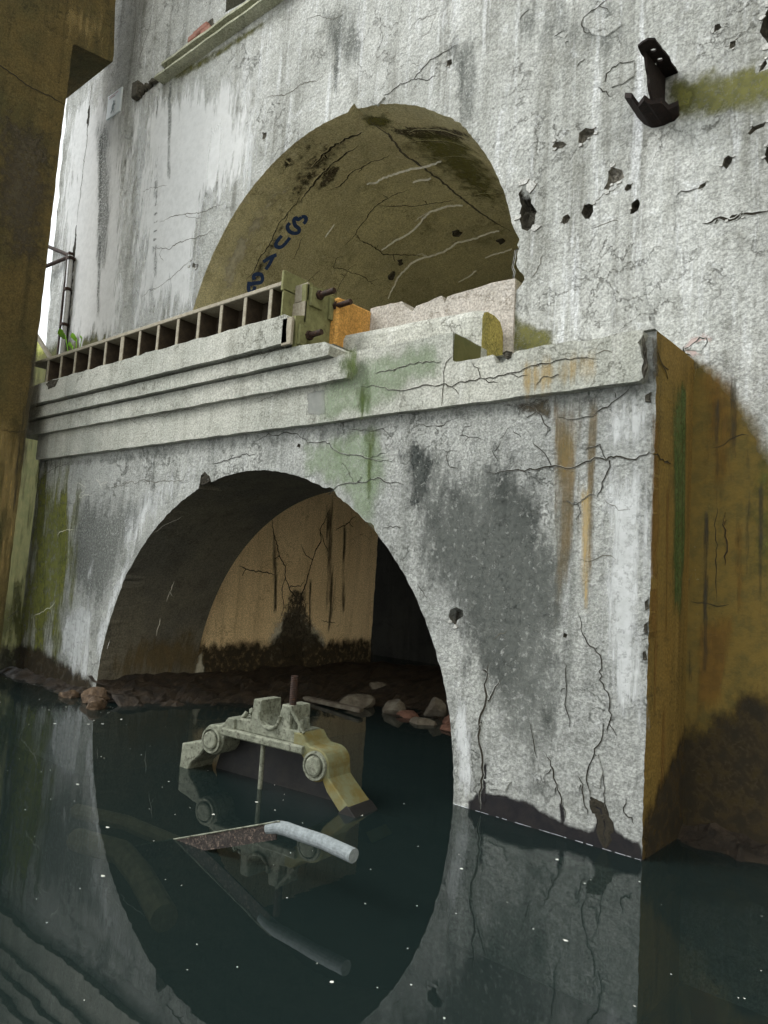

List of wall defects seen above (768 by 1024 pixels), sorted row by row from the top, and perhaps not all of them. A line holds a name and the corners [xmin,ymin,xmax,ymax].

crack [246,119,542,299]
spalling [514,178,541,231]
spalling [552,127,598,151]
spalling [560,163,643,224]
spalling [719,155,735,169]
damp [0,72,259,689]
crack [214,350,671,646]
spalling [448,607,463,629]
damp [409,399,596,737]
damp [457,337,768,861]
crack [477,663,501,809]
crack [528,611,634,849]